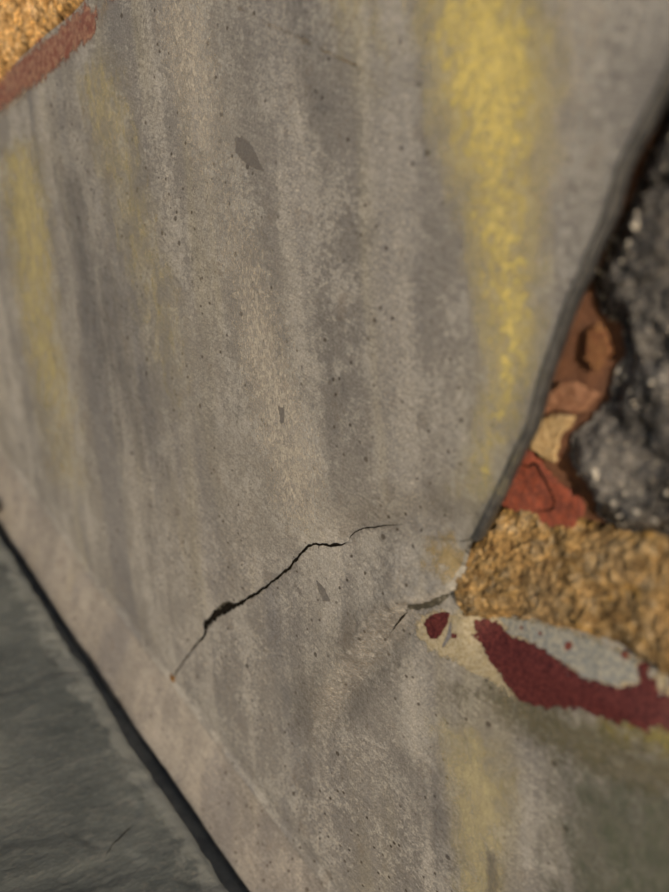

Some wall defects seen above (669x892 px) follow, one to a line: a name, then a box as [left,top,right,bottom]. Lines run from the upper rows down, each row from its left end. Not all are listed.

peeling [0,1,97,111]
water stain [415,0,564,495]
spalling [584,322,613,372]
spalling [502,380,601,528]
crack [174,524,405,677]
peeling [415,609,669,734]